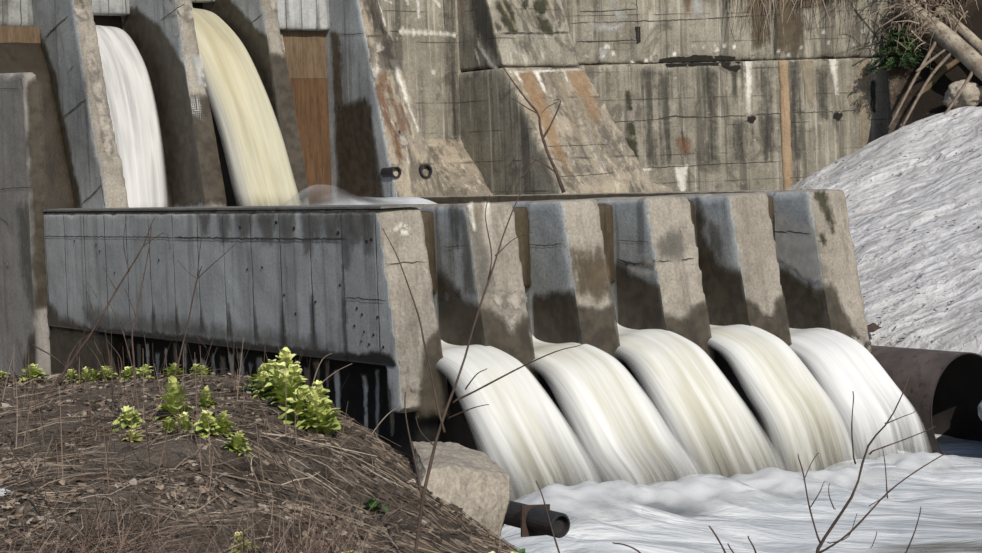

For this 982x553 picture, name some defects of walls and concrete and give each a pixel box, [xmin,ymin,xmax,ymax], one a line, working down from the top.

water stain [472,0,577,93]
corrosion [376,73,409,154]
water stain [631,59,688,191]
water stain [707,71,717,161]
water stain [732,61,772,158]
water stain [777,46,851,158]
water stain [87,303,327,379]
water stain [299,360,340,411]
water stain [362,371,394,437]
water stain [420,197,873,416]